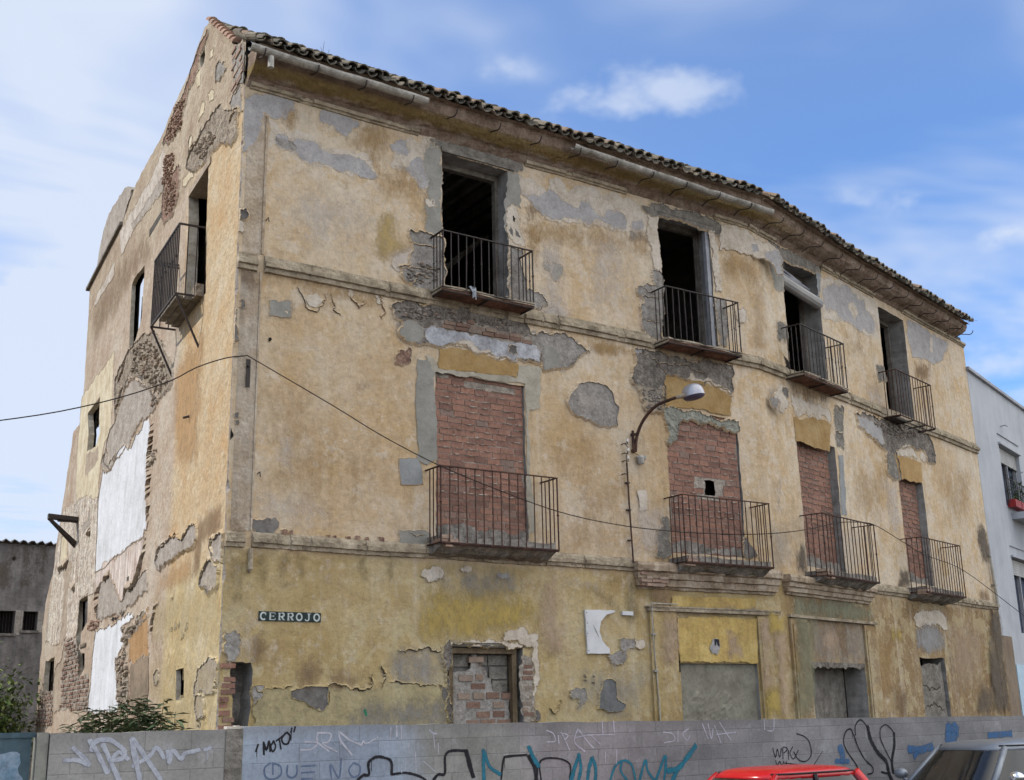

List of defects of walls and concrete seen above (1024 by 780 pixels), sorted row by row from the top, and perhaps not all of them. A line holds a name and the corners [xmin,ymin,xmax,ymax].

peeling [94,28,379,306]
flaking render [388,137,590,377]
peeling [476,161,879,447]
flaking render [768,384,936,515]
peeling [35,328,225,729]
peeling [193,629,241,730]
peeling [419,565,445,583]
peeling [249,626,646,726]
peeling [913,609,948,653]